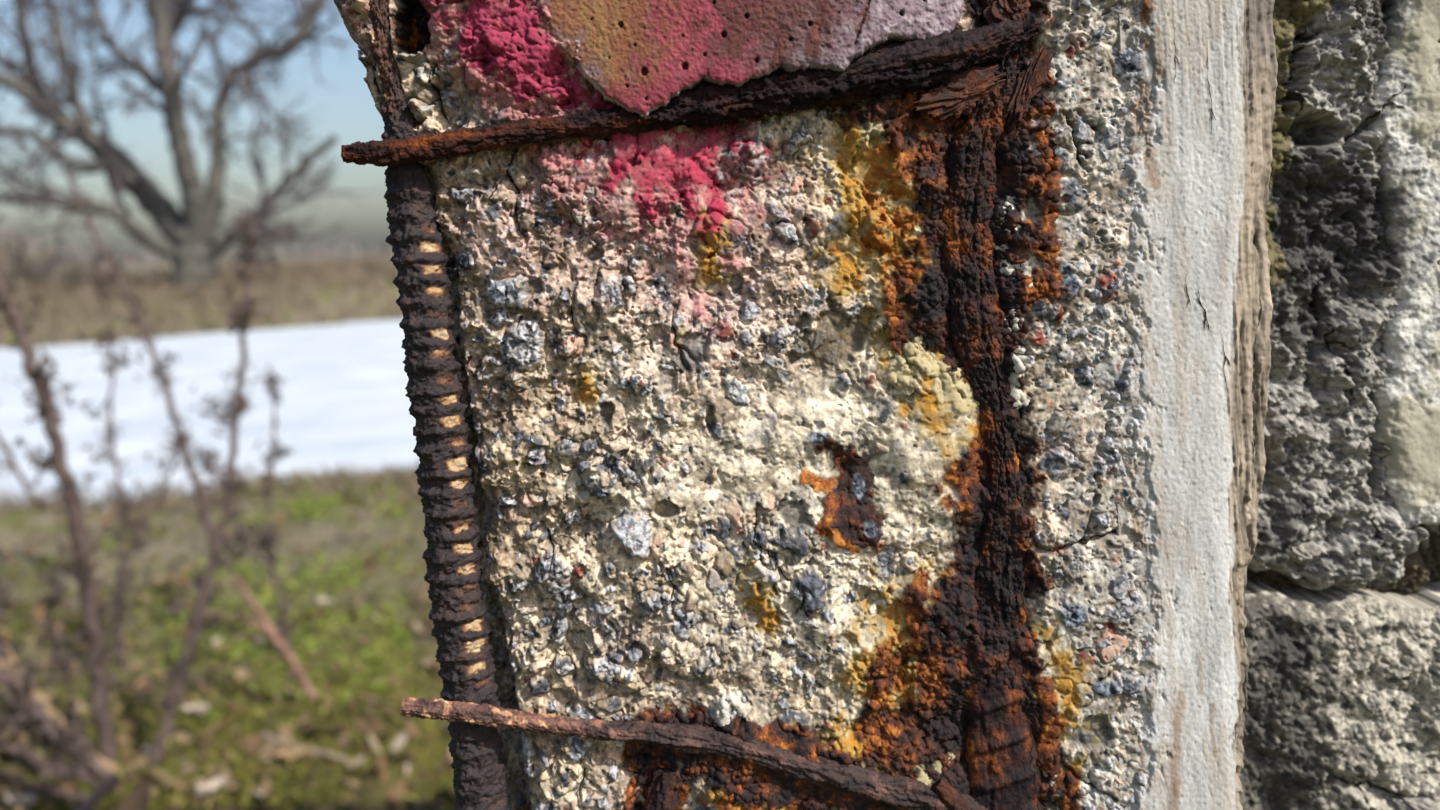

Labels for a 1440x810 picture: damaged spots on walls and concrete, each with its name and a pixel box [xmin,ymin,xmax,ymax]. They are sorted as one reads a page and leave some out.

rust [391,0,431,54]
spalling [333,0,598,136]
rust [538,0,680,92]
rust [686,0,869,75]
spalling [958,0,976,31]
rust [958,0,985,30]
rust [1015,0,1060,81]
spalling [418,82,980,773]
rust [620,71,1088,810]
spalling [1009,0,1157,810]
spalling [500,728,645,810]
spalling [673,759,737,810]